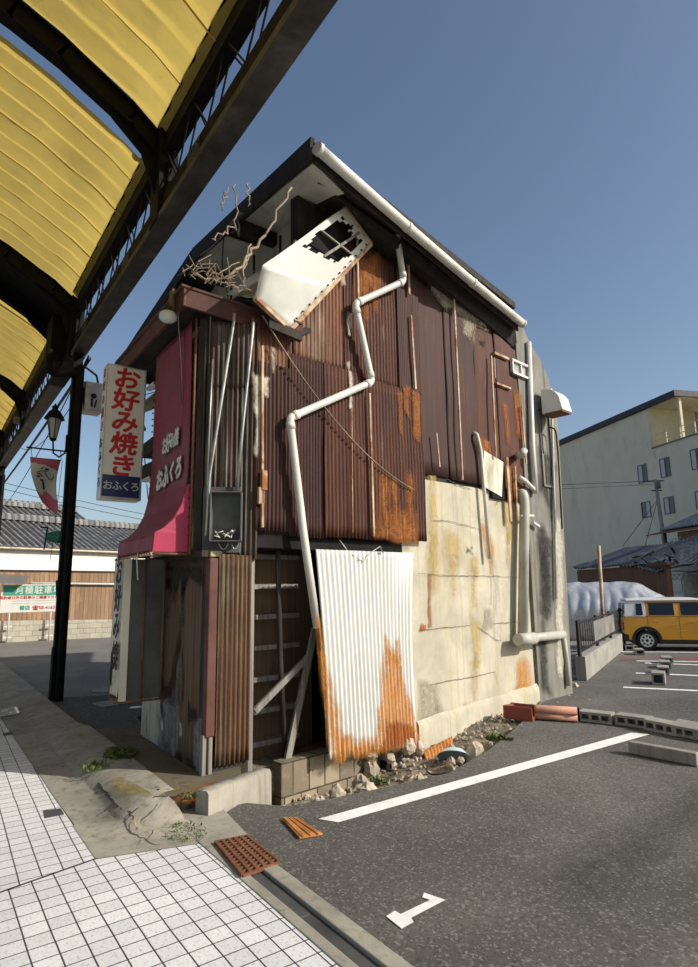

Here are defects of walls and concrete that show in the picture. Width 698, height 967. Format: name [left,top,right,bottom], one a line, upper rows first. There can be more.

rust [360,256,381,301]
rust [398,387,420,439]
rust [503,394,522,436]
rust [376,476,417,542]
water stain [538,450,564,694]
rust [420,575,432,631]
water stain [158,566,202,772]
rust [321,639,419,761]
rust [518,662,532,689]